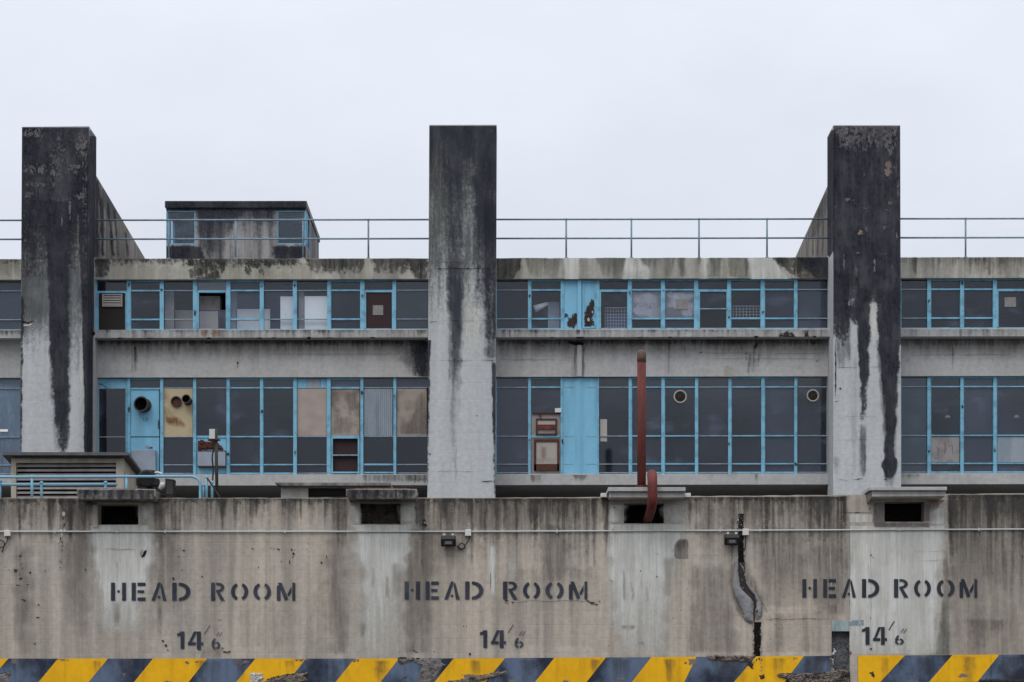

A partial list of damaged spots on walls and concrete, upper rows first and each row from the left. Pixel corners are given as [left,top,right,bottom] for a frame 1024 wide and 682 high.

water stain [0,126,1024,654]
peeling [564,299,594,346]
spalling [398,650,517,682]
crack [737,498,778,672]